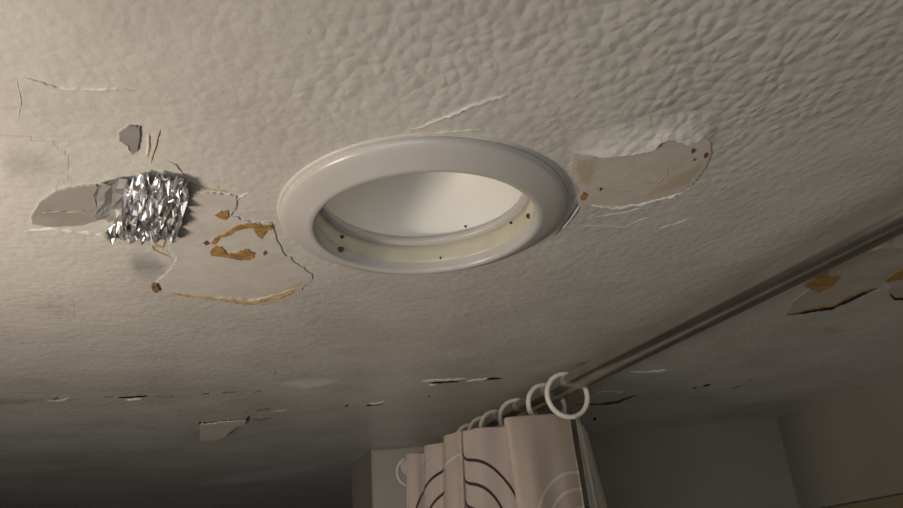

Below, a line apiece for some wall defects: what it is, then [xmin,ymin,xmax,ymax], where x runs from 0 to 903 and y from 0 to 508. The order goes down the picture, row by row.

spalling [119,124,140,154]
peeling [571,108,724,210]
peeling [151,161,312,305]
peeling [784,240,903,316]
crack [105,394,172,402]
peeling [199,408,288,442]